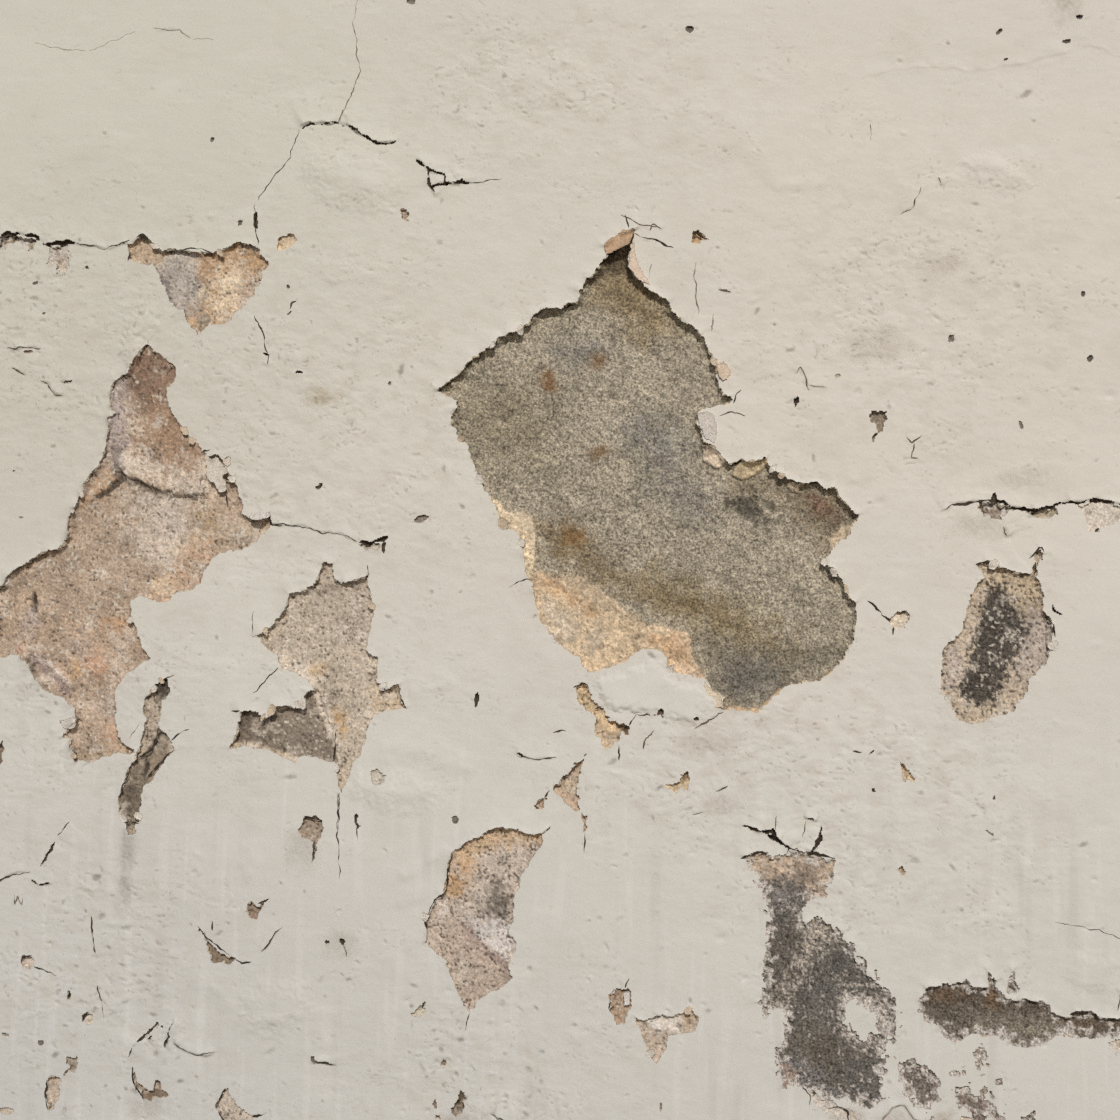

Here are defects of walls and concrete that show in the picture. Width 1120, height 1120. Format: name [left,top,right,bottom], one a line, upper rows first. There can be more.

peeling [127,233,269,335]
peeling [277,233,297,251]
crack [253,0,396,243]
crack [416,159,500,192]
peeling [0,344,283,835]
peeling [228,562,407,830]
spalling [437,215,910,759]
peeling [941,547,1059,724]
crack [942,492,1120,536]
peeling [298,815,324,861]
peeling [421,827,550,1030]
spalling [741,847,1120,1120]